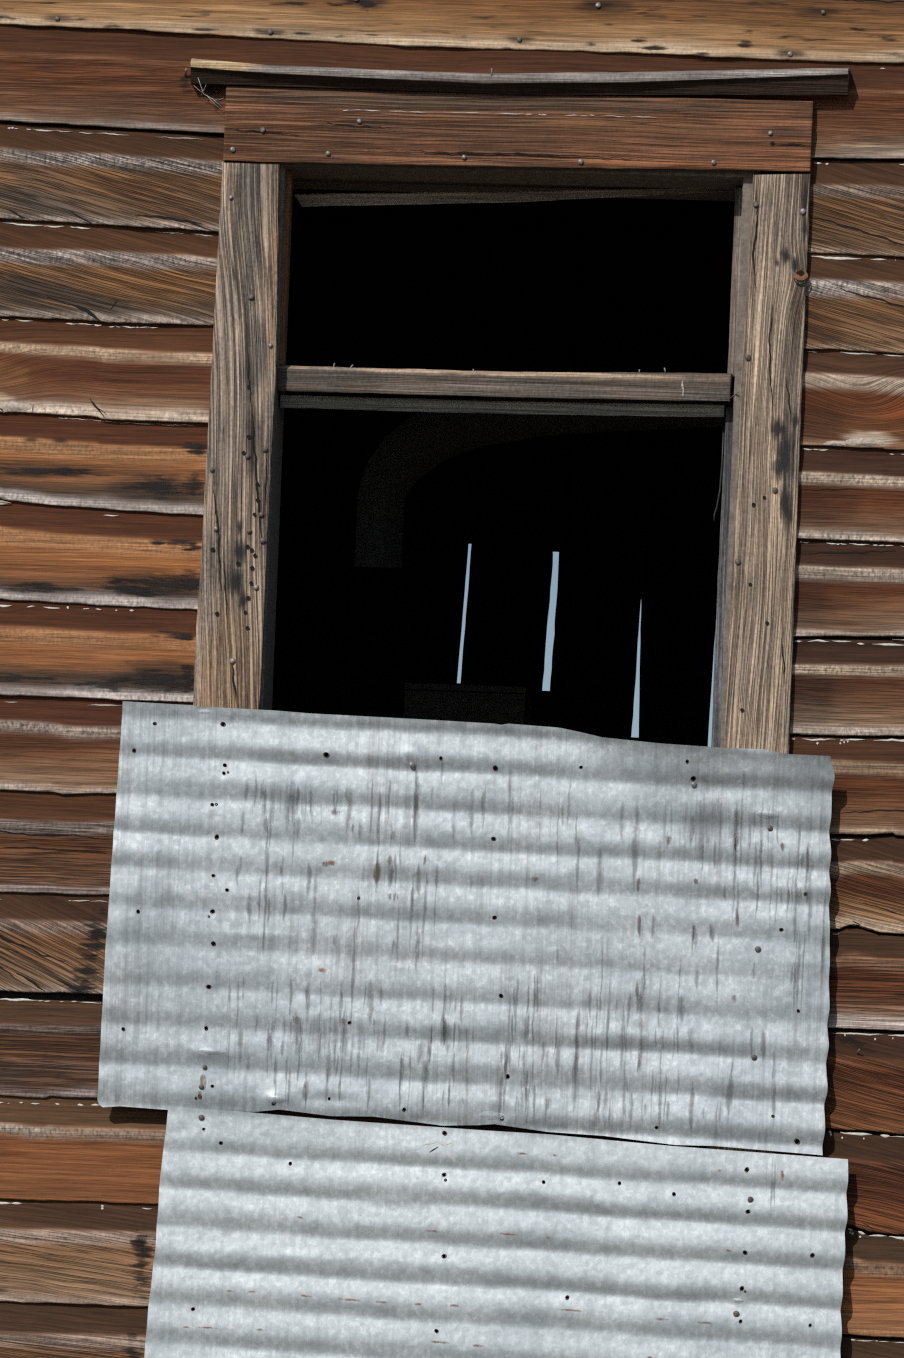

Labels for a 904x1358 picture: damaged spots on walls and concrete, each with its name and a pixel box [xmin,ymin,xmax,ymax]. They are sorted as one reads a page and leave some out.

crack [842,902,903,932]